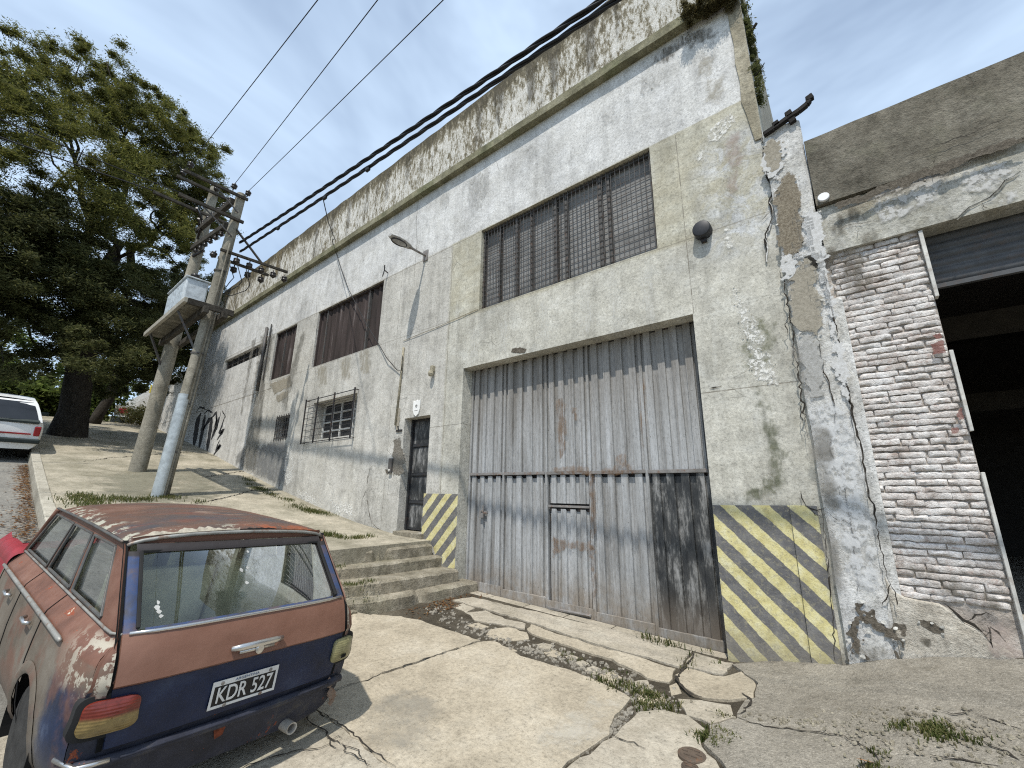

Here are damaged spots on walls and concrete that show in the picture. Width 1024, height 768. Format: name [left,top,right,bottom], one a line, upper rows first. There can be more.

flaking render [834,137,1024,221]
crack [957,171,1021,220]
flaking render [760,137,828,398]
crack [761,130,898,659]
damp [748,426,780,499]
flaking render [846,600,945,662]
crack [945,604,1006,645]
crack [673,652,702,697]
crack [243,711,396,768]